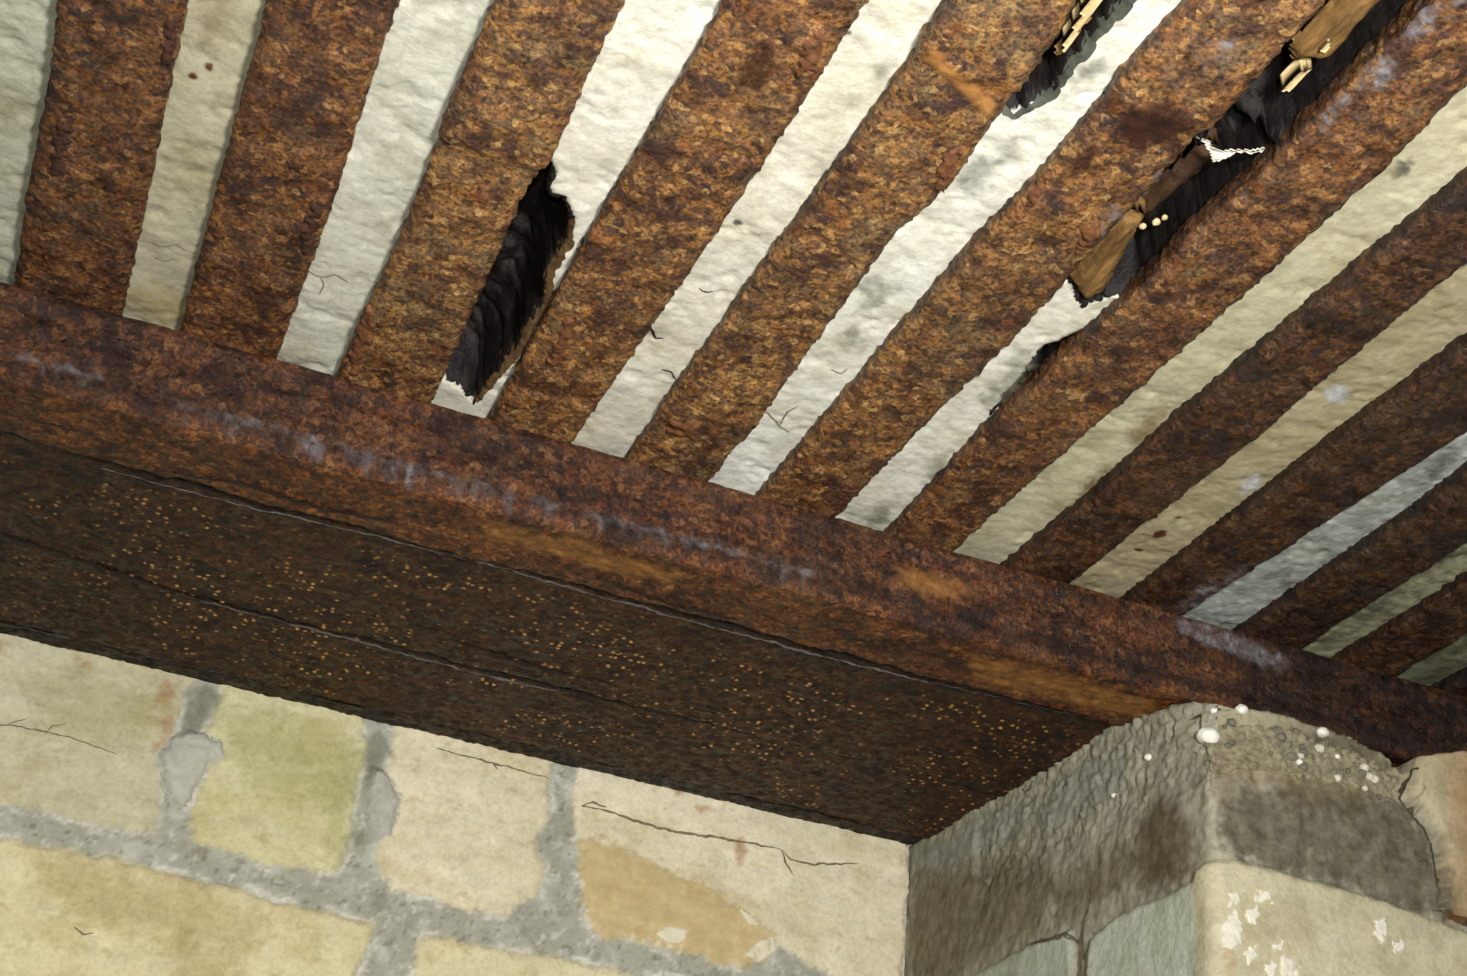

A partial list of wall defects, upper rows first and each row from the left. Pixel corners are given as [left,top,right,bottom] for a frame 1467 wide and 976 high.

corrosion [934,145,966,194]
corrosion [929,51,995,112]
spalling [1002,0,1137,119]
corrosion [1123,104,1195,149]
spalling [1066,0,1409,308]
hole [446,161,576,405]
crack [6,432,1115,725]
crack [0,533,858,779]
leakage [1312,734,1388,771]
crack [581,801,858,874]
leakage [1220,779,1454,920]
crack [1398,767,1467,927]